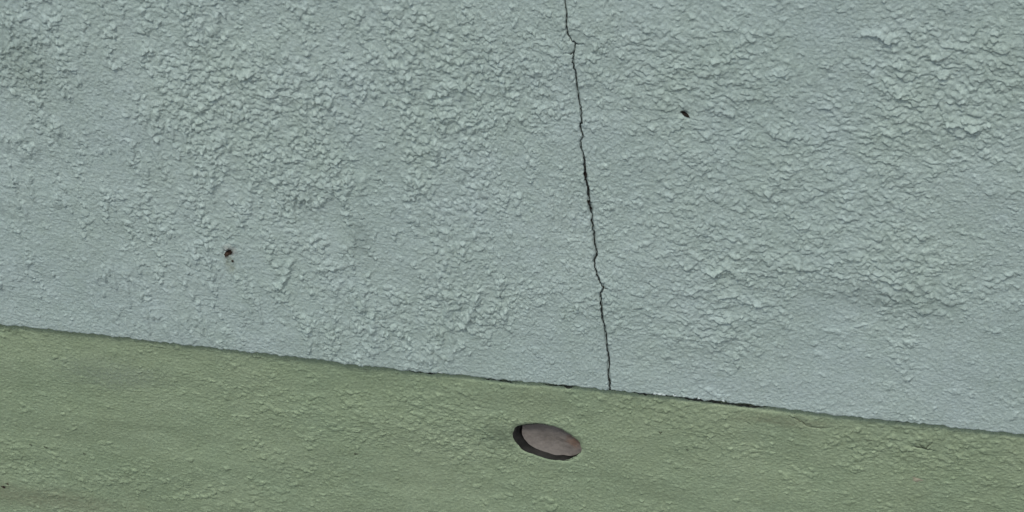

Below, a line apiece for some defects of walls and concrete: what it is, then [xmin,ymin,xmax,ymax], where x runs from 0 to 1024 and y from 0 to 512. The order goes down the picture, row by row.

crack [565,4,611,390]